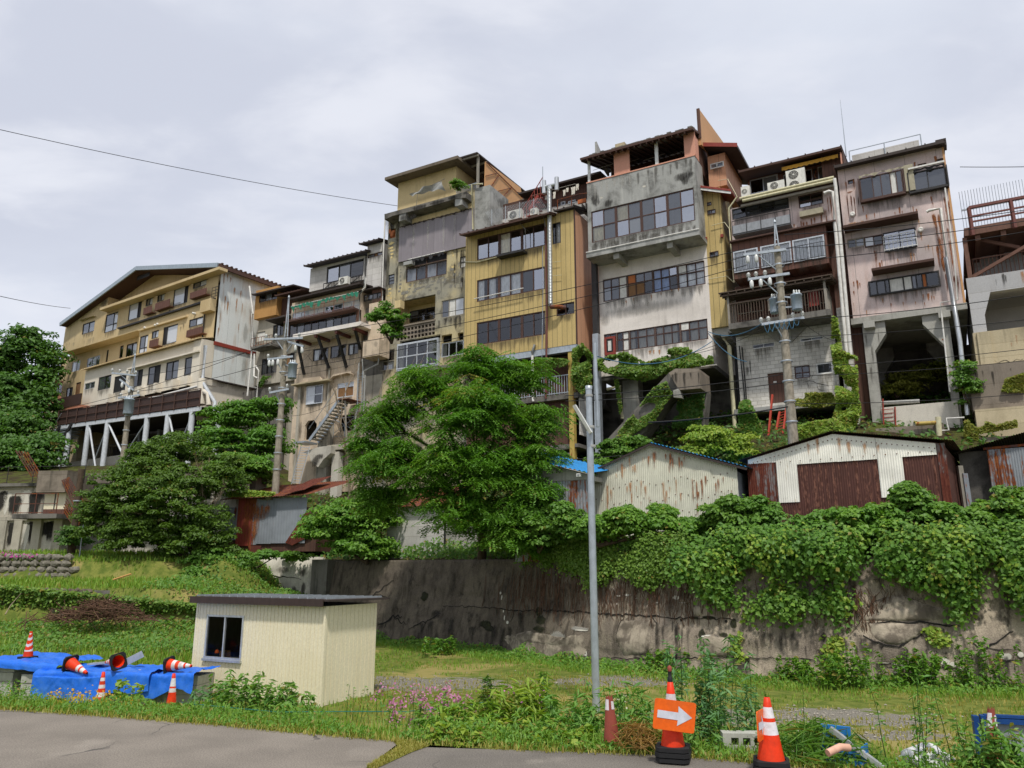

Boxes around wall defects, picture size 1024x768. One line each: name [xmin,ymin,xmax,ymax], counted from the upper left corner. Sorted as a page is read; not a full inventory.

rust [897,197,962,290]
rust [616,452,685,502]
rust [663,476,724,508]
rust [285,512,309,545]
crack [372,580,815,661]
crack [863,620,1021,671]